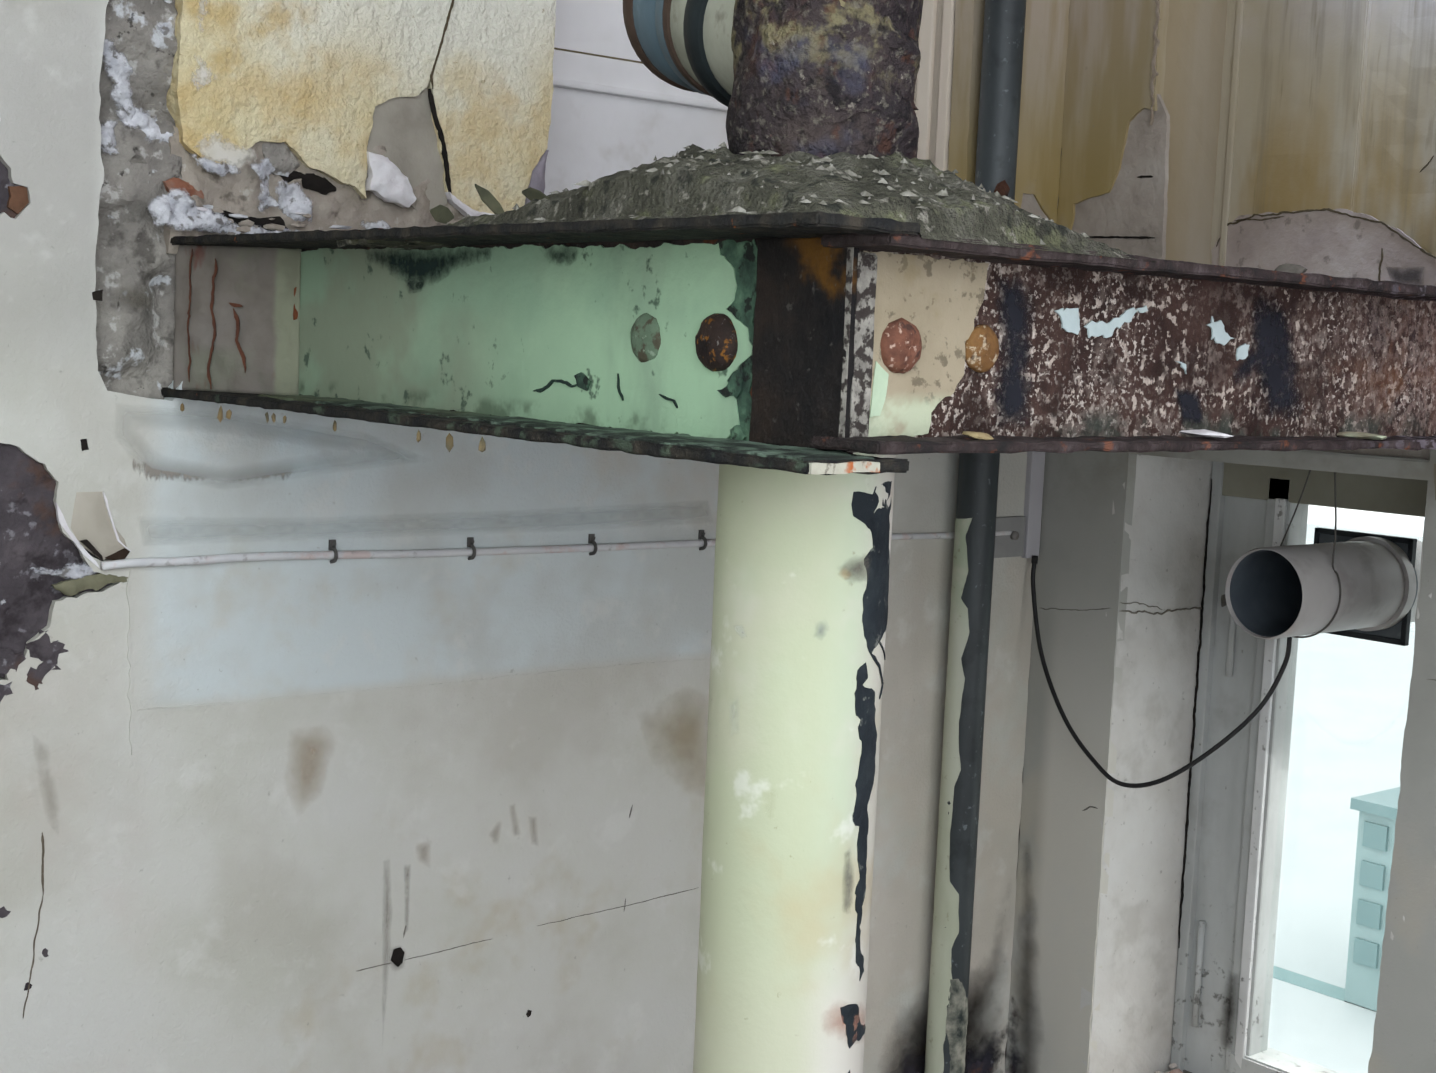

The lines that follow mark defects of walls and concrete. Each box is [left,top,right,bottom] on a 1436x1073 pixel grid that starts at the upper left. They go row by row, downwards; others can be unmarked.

leakage [200,138,253,167]
spalling [148,88,493,254]
crack [428,0,454,194]
spalling [525,150,549,205]
peeling [1021,0,1170,260]
peeling [1211,208,1436,286]
spalling [0,443,128,702]
peeling [851,481,892,981]
peeling [840,1004,866,1049]